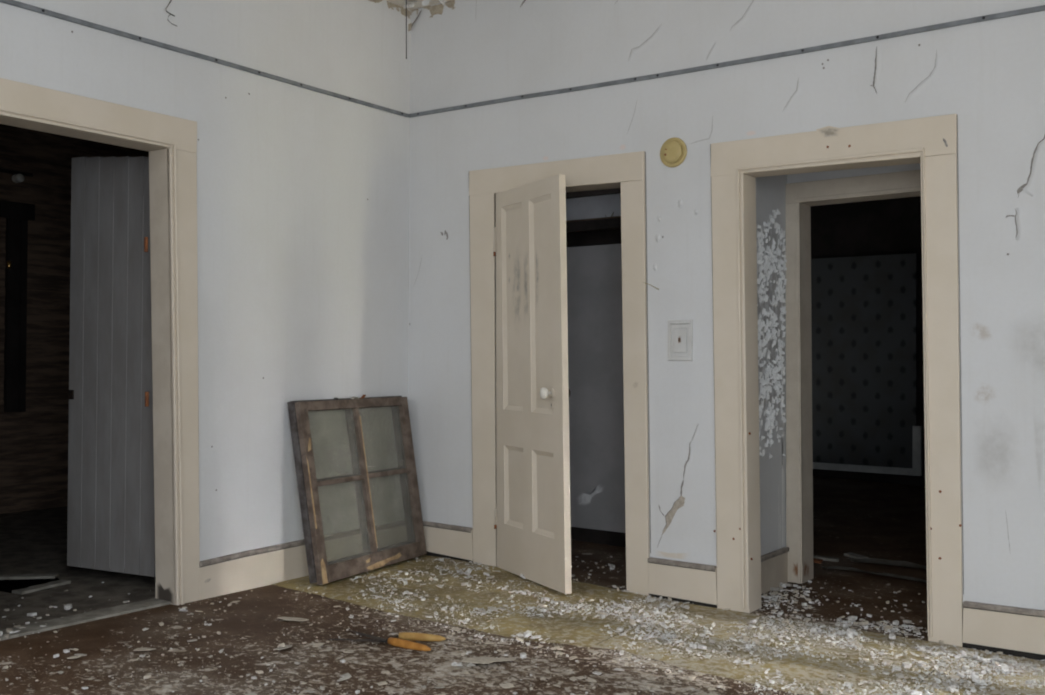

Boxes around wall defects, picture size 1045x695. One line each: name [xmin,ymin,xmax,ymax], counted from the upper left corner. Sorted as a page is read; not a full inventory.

peeling [369,0,455,31]
crack [870,46,883,94]
crack [1006,135,1045,241]
crack [657,424,702,548]